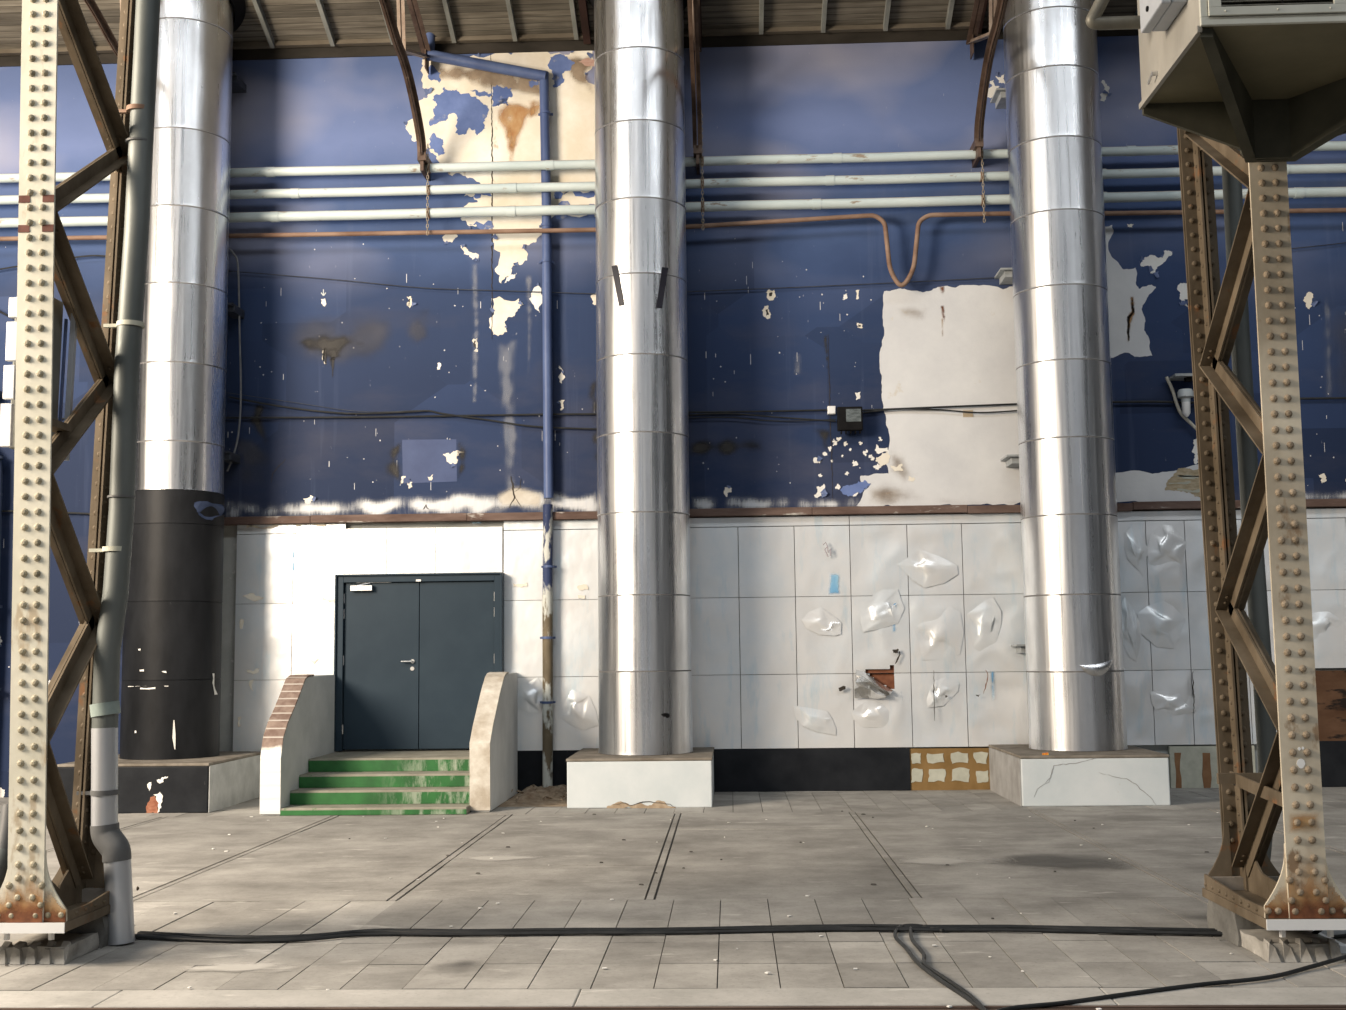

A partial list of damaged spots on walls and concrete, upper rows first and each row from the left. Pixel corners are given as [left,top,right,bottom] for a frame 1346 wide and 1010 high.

corrosion [499,105,539,149]
peeling [404,51,596,336]
peeling [1140,250,1172,278]
peeling [1177,283,1188,308]
leakage [500,489,540,505]
corrosion [0,890,66,923]
corrosion [1265,871,1346,919]